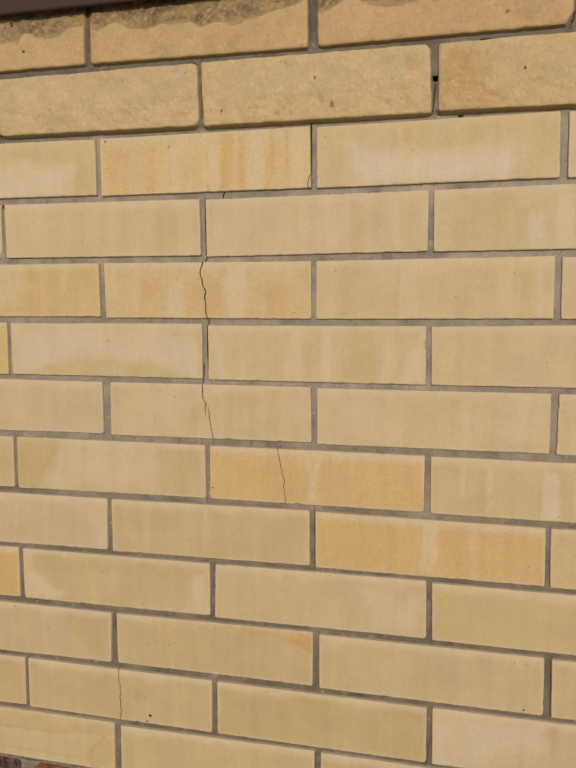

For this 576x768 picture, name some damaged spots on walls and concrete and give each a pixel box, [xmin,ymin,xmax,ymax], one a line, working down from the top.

crack [200,191,243,436]